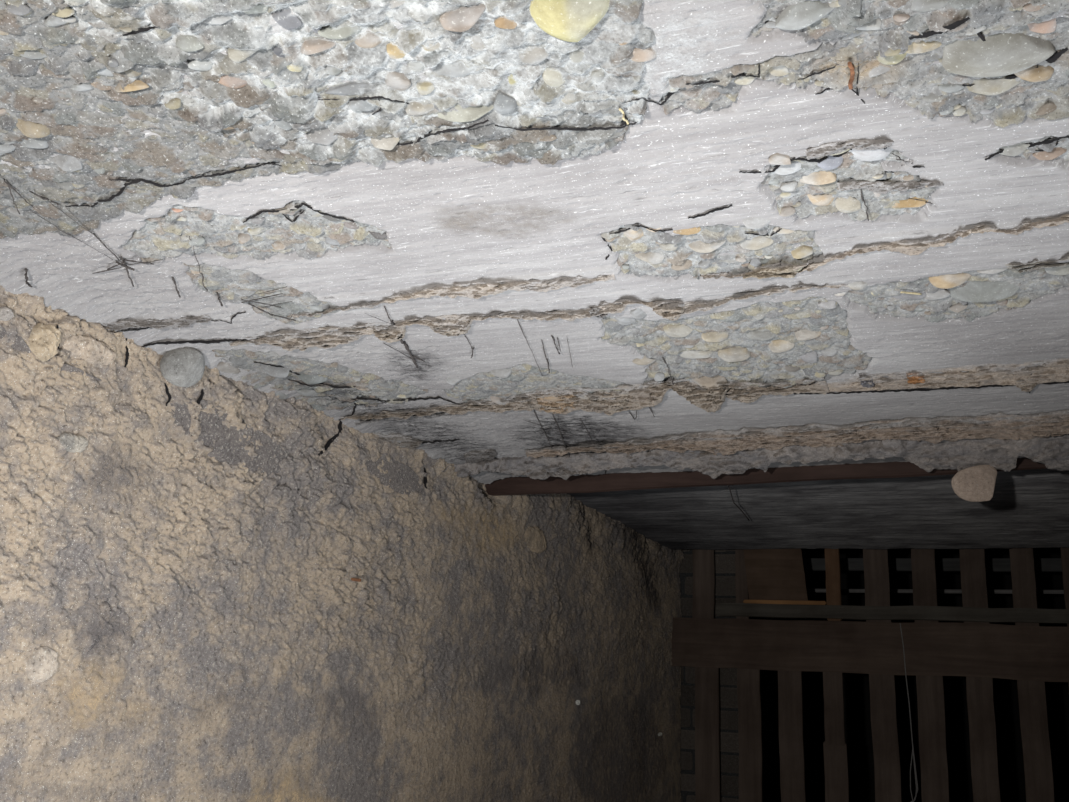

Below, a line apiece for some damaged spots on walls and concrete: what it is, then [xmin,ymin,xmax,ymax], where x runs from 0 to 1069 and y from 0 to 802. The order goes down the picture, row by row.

spalling [0,0,1069,325]
spalling [212,349,429,411]
spalling [444,265,1069,414]
spalling [442,434,1069,480]